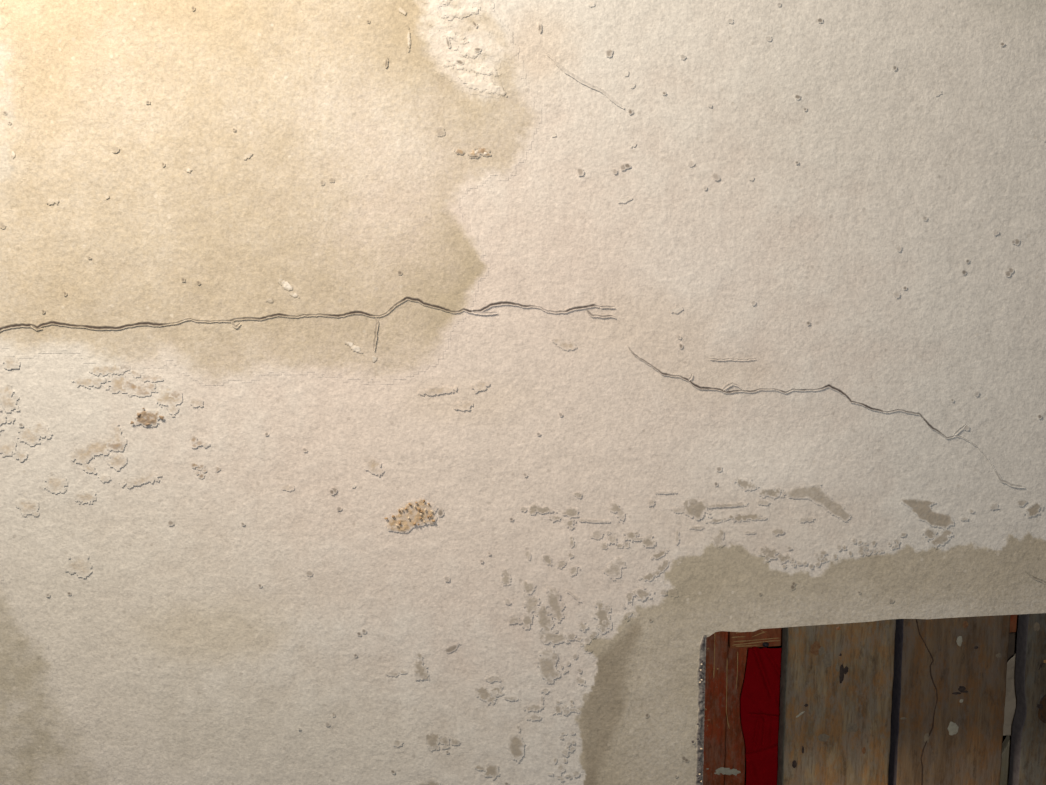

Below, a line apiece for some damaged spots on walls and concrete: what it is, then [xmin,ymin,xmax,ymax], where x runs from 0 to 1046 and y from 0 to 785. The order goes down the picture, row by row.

damp [0,0,542,417]
crack [0,296,616,351]
crack [627,345,1025,488]
peeling [474,477,1046,785]